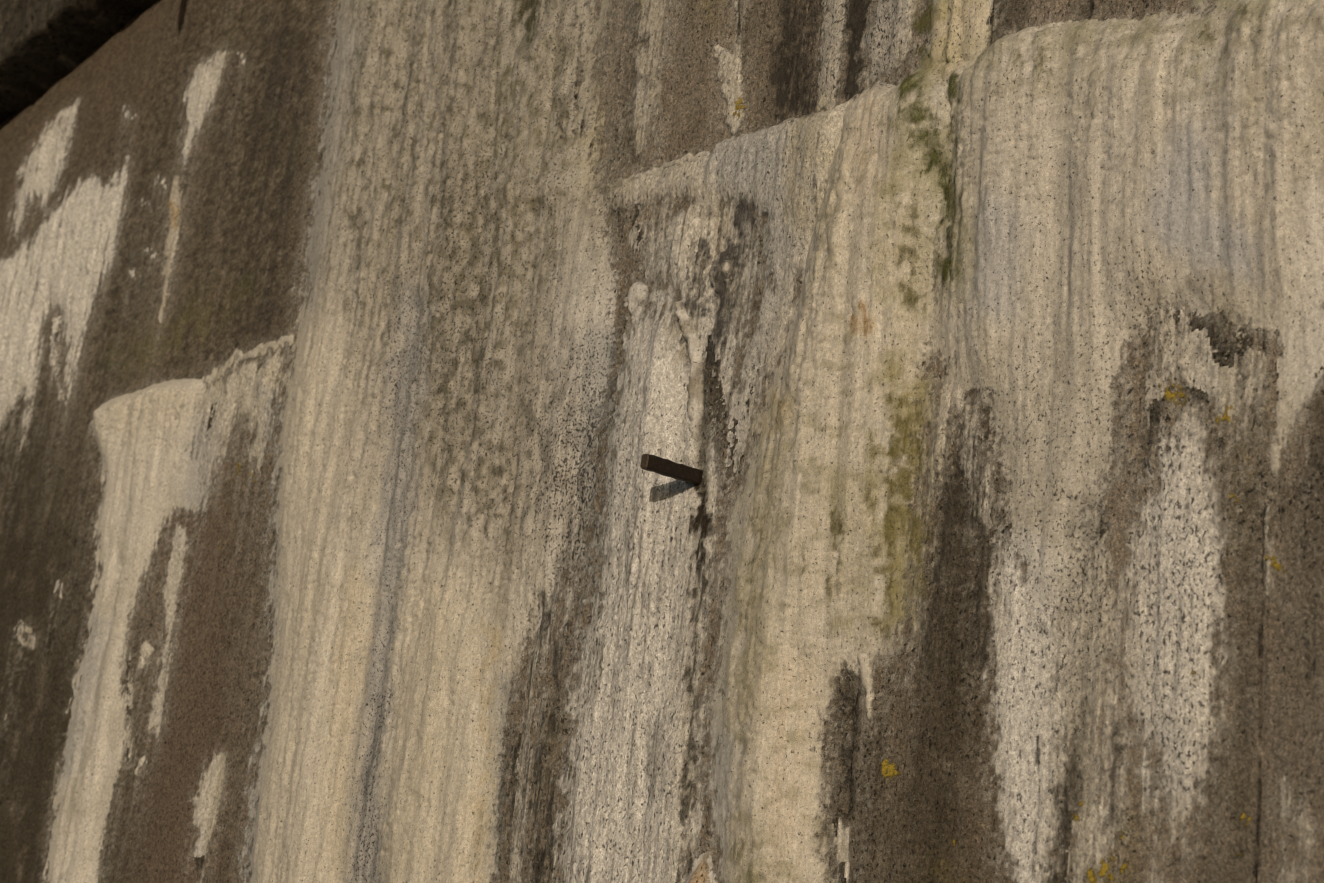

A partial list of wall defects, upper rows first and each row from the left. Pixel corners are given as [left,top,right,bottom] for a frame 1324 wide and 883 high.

water stain [0,97,130,451]
water stain [158,50,230,325]
water stain [674,199,755,442]
water stain [927,150,951,279]
water stain [121,524,190,763]
water stain [192,751,227,883]
water stain [679,744,696,839]
water stain [684,491,708,728]
water stain [826,818,850,883]
water stain [857,652,875,719]
water stain [911,419,993,671]
water stain [1049,646,1169,883]